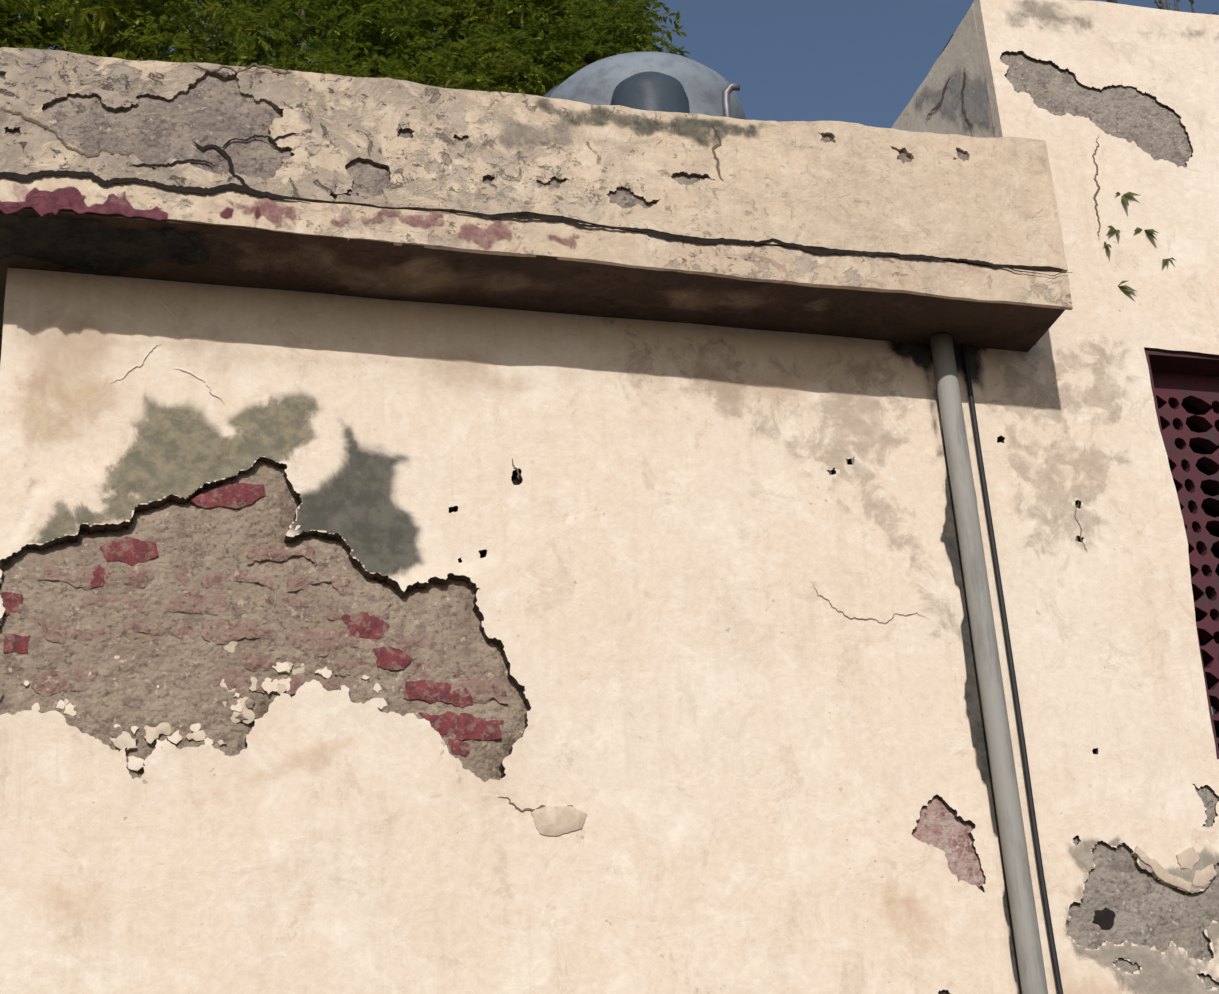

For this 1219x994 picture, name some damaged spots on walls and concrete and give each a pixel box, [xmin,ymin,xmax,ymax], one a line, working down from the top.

peeling [0,186,168,220]
leakage [0,212,208,276]
crack [0,108,311,201]
crack [712,127,723,180]
crack [420,208,1072,276]
flaking render [1000,53,1192,168]
crack [1092,137,1101,237]
leakage [32,395,318,543]
leakage [291,428,420,575]
flaking render [0,461,528,782]
flaking render [912,796,984,890]
flaking render [1065,842,1219,990]